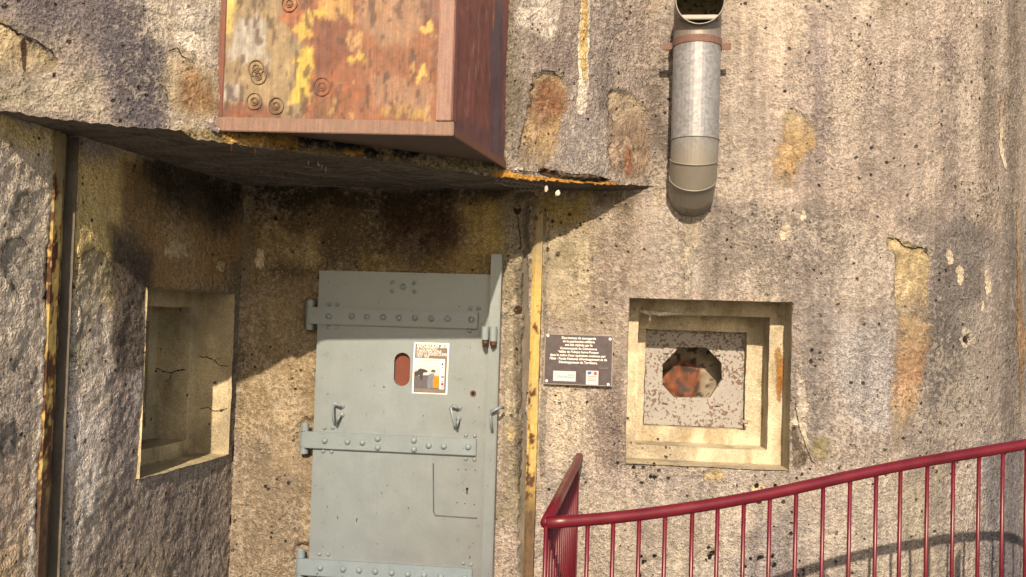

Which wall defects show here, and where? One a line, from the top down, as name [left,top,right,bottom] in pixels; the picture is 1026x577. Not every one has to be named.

spalling [0,21,57,74]
water stain [576,0,591,115]
spalling [520,70,568,157]
spalling [605,90,650,172]
spalling [887,237,929,309]